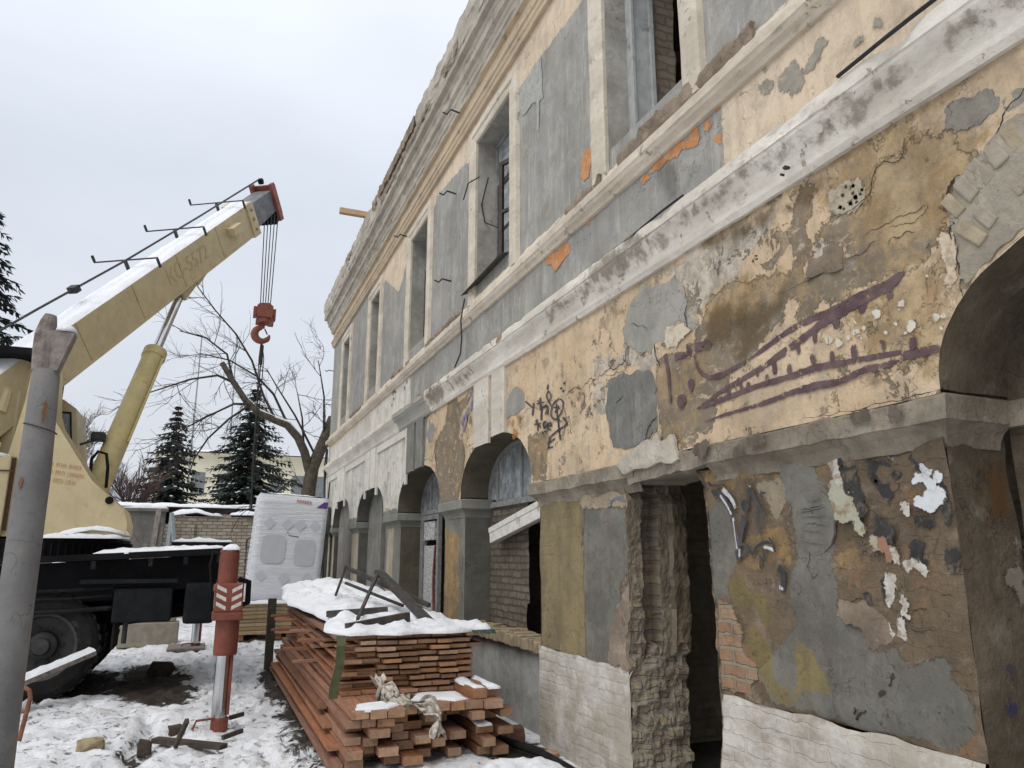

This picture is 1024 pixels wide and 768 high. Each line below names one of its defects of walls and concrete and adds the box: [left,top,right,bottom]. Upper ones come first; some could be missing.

spalling [564,147,602,215]
spalling [641,107,722,184]
spalling [616,20,756,166]
spalling [758,35,828,98]
spalling [828,178,866,216]
crack [761,175,963,309]
spalling [936,113,1024,288]
crack [988,89,1024,145]
peeling [664,322,691,348]
peeling [827,451,954,651]
spalling [608,580,634,672]
spalling [716,599,759,701]